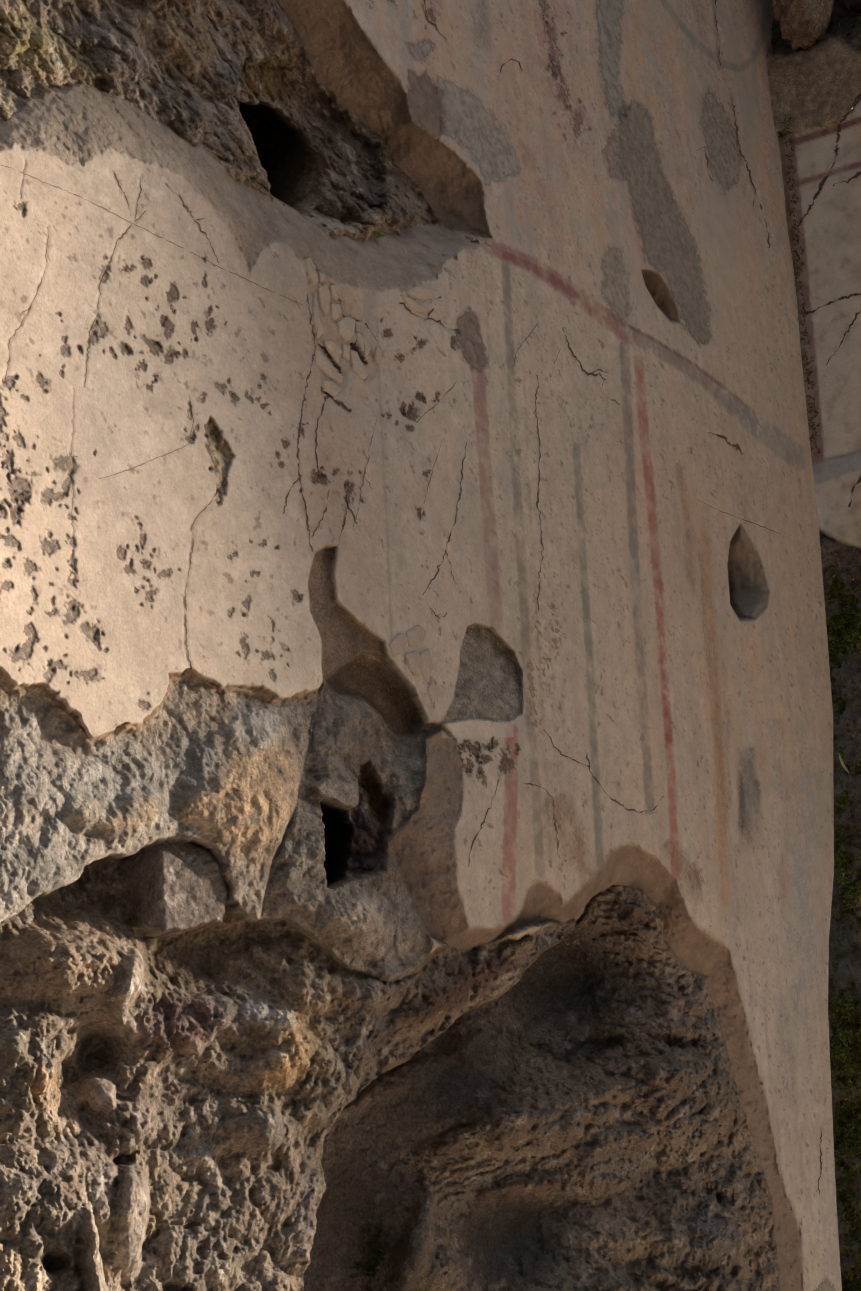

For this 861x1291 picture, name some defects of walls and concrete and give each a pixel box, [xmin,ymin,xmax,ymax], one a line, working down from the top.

flaking render [0,0,439,240]
peeling [36,254,226,393]
crack [71,173,219,569]
crack [283,257,382,552]
crack [399,286,458,330]
crack [804,293,861,365]
crack [184,476,228,670]
crack [388,381,467,711]
flaking render [0,374,576,1291]
crack [543,729,664,813]